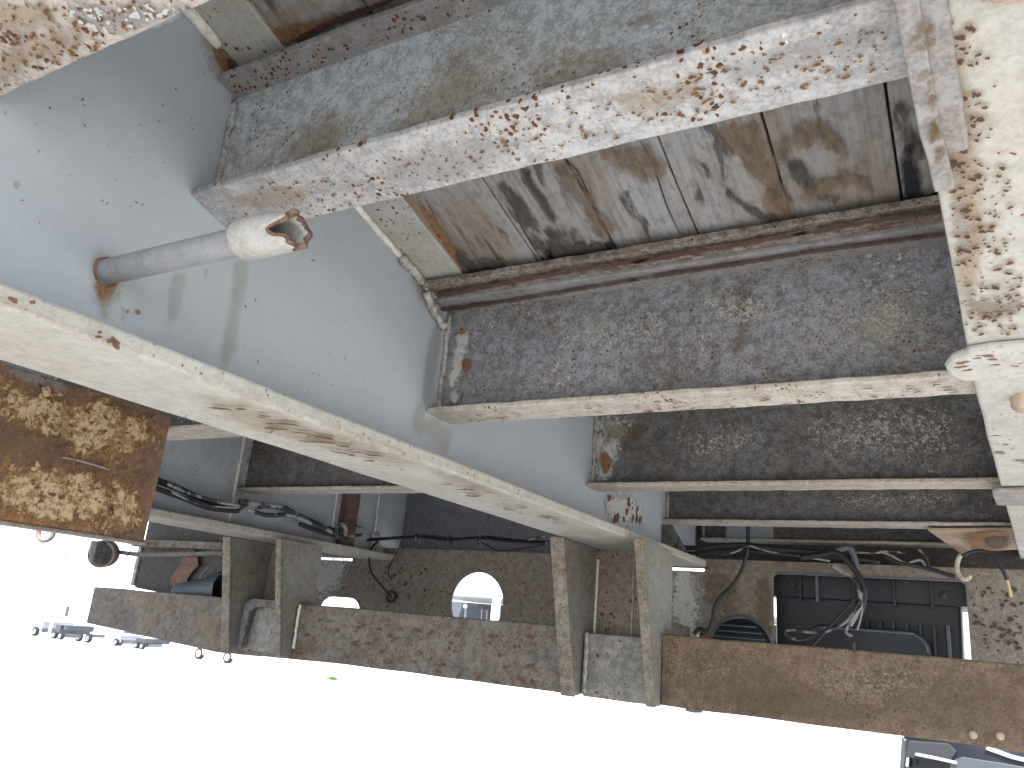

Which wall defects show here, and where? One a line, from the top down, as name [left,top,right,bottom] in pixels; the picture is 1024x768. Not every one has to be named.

rust [0,3,167,72]
rust [954,26,990,67]
rust [255,167,386,210]
rust [388,53,786,182]
water stain [602,145,666,183]
rust [421,92,1024,336]
water stain [717,120,869,223]
water stain [892,102,938,200]
rust [96,282,115,299]
rust [22,404,152,515]
rust [600,452,611,474]
rust [317,619,547,685]